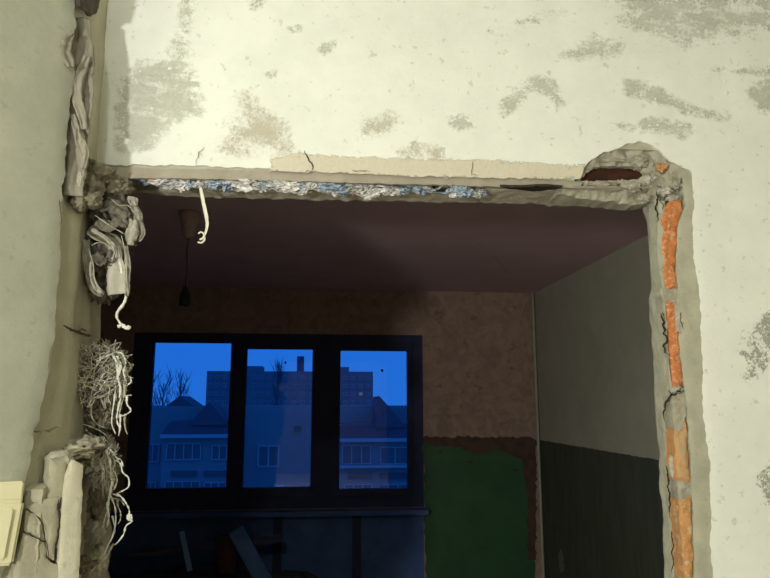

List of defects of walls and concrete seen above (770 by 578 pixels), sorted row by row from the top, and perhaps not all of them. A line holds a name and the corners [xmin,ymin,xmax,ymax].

peeling [625,0,770,46]
peeling [113,41,198,150]
peeling [621,78,721,139]
flaking render [228,100,694,578]
crack [660,312,684,356]
peeling [738,313,770,379]
crack [662,386,683,418]
crack [26,499,61,561]
crack [665,465,674,571]